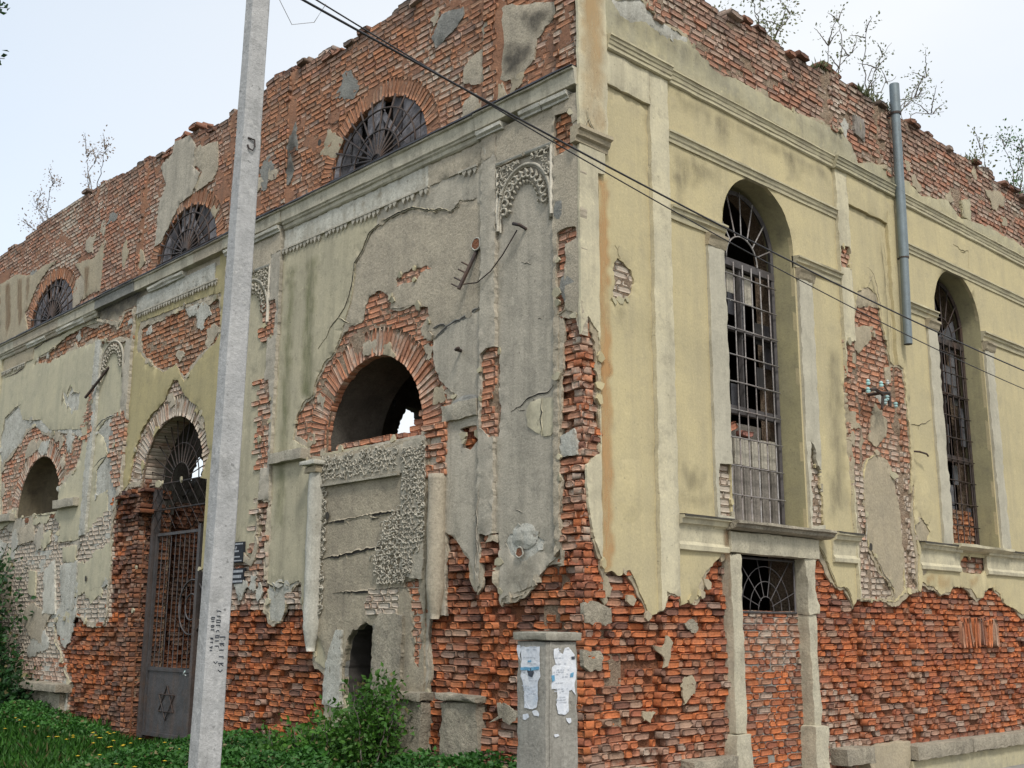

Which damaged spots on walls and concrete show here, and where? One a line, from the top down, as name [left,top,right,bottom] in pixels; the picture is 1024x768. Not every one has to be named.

spalling [256,0,577,217]
spalling [0,110,238,329]
spalling [258,300,277,343]
peeling [293,199,501,478]
crack [318,198,479,349]
spalling [0,290,221,737]
spalling [223,498,325,737]
crack [322,546,384,560]
crack [324,510,400,525]
crack [335,586,408,595]
spalling [406,227,731,768]
spalling [815,287,1024,768]